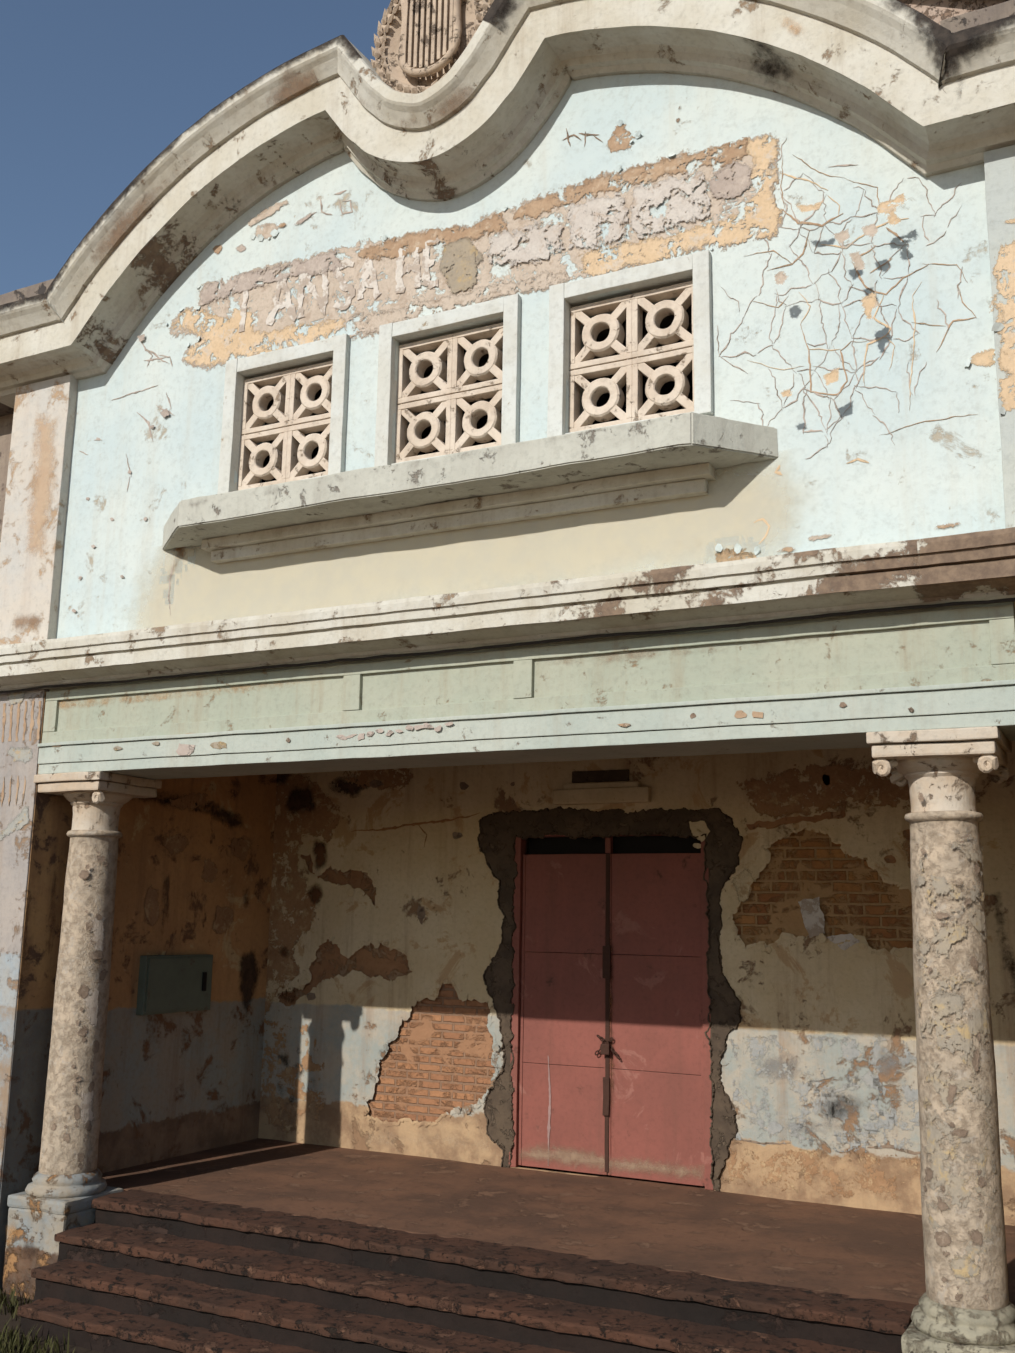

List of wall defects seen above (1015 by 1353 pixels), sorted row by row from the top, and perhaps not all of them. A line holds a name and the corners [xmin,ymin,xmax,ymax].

water stain [483,0,516,31]
water stain [751,40,789,76]
water stain [890,0,1015,88]
peeling [130,184,311,296]
peeling [166,120,784,371]
peeling [77,316,128,364]
crack [717,137,976,475]
peeling [963,241,1015,415]
peeling [560,523,1015,621]
peeling [343,768,413,790]
peeling [260,773,416,1134]
spalling [363,763,998,1301]